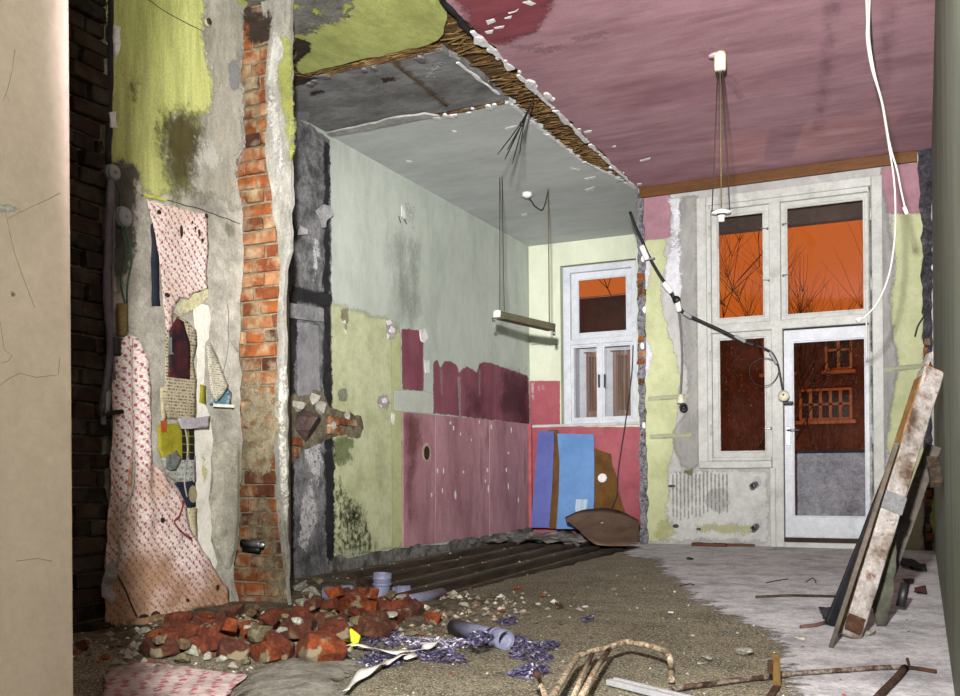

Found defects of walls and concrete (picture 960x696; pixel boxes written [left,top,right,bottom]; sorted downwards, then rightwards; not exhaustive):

leakage [162,113,208,182]
flaking render [69,0,442,663]
leakage [333,485,372,557]
flaking render [292,0,651,544]